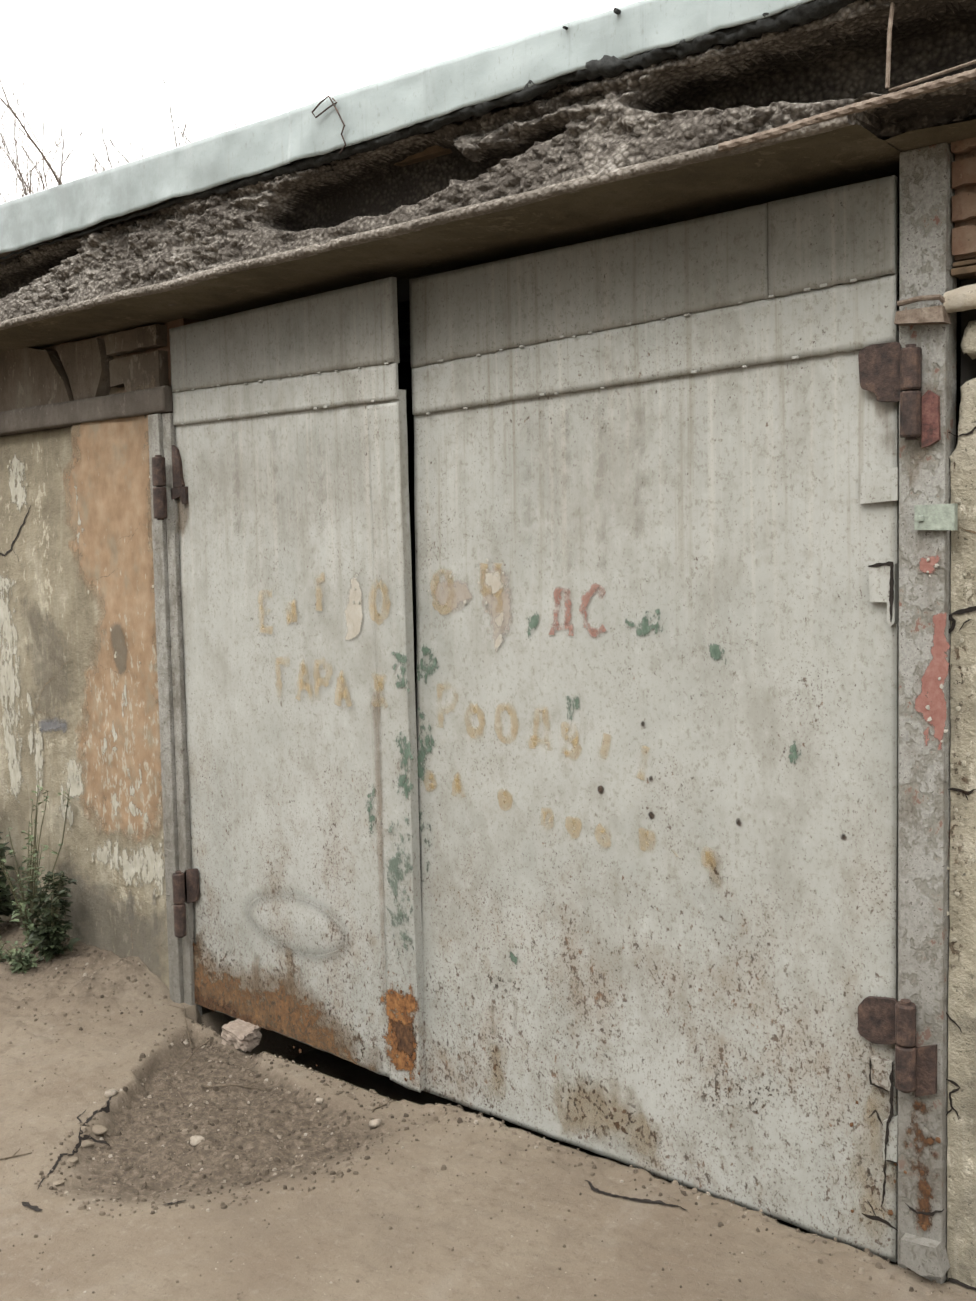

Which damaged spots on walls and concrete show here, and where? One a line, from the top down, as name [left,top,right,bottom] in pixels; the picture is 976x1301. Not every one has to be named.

spalling [643,0,976,137]
spalling [273,125,566,232]
spalling [0,249,79,299]
crack [0,506,31,562]
peeling [7,455,28,510]
peeling [0,571,43,802]
peeling [56,414,164,897]
rust [192,937,423,1085]